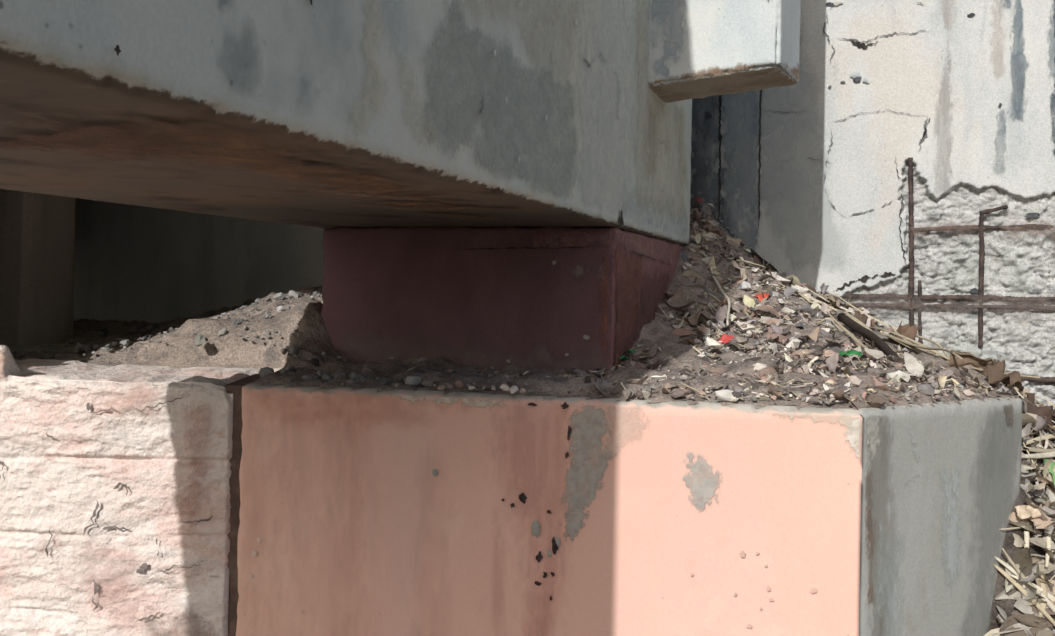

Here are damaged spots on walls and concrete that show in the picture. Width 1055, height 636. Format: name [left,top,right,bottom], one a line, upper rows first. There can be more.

flaking render [828,71,869,89]
crack [823,5,926,63]
water stain [1004,0,1028,119]
crack [780,109,930,291]
spalling [839,161,1055,410]
crack [85,396,186,413]
crack [83,482,131,535]
peeling [531,402,639,586]
peeling [683,453,719,510]
crack [136,538,202,573]
crack [91,579,99,611]